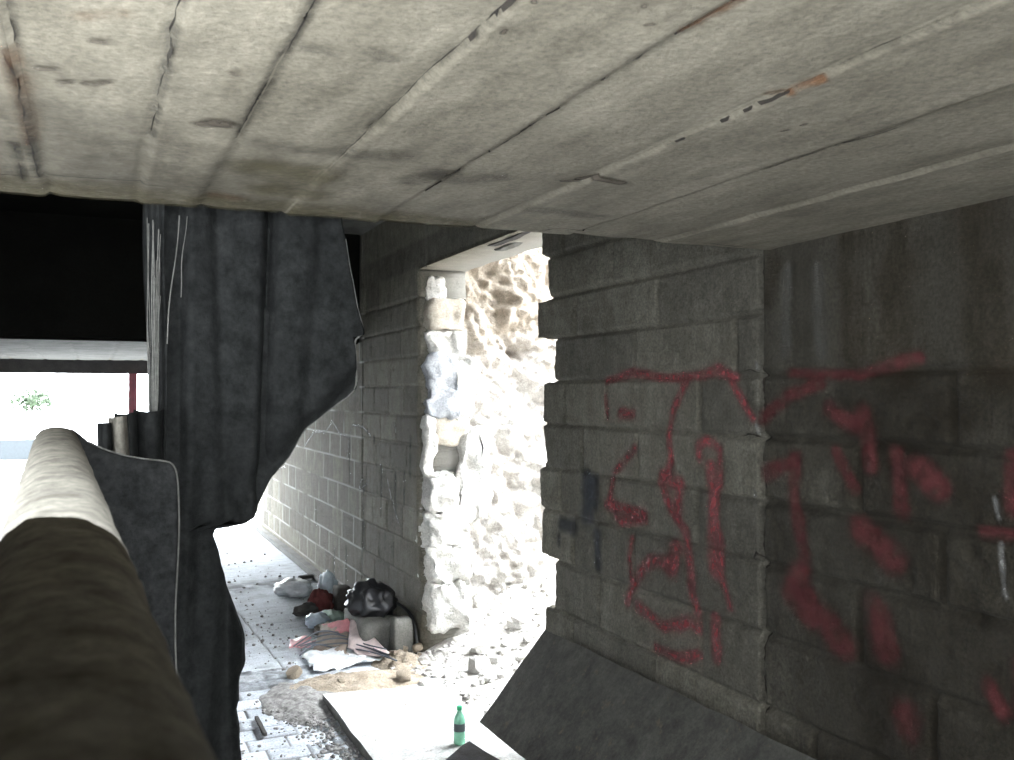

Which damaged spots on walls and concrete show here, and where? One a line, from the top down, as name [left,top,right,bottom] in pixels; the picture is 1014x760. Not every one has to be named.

crack [720,90,790,123]
spalling [415,276,494,634]